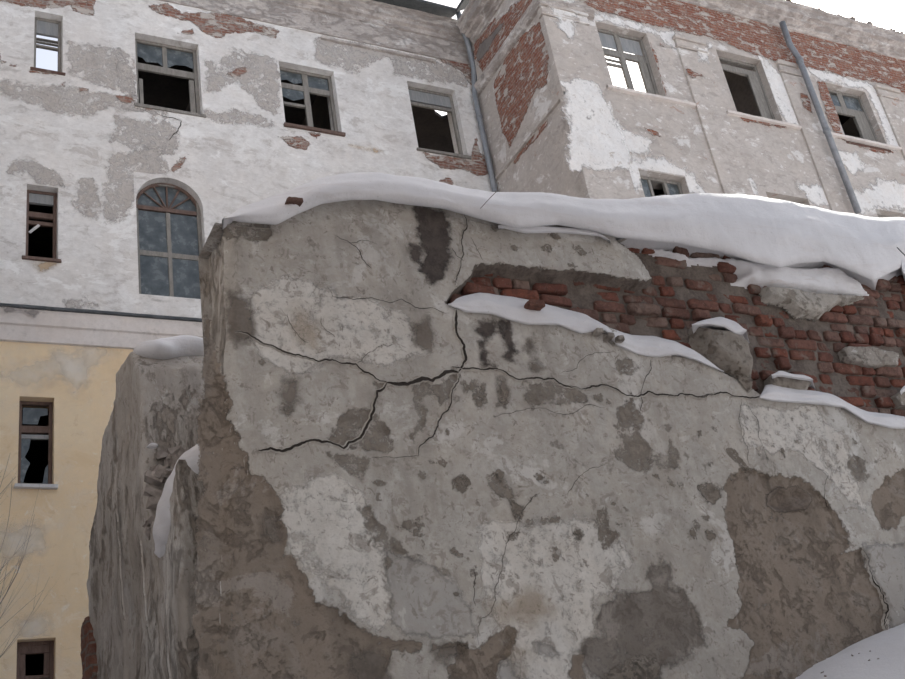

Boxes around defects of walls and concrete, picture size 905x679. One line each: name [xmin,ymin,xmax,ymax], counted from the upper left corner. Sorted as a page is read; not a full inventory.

spalling [0,0,96,16]
spalling [149,3,279,38]
spalling [315,0,549,164]
spalling [423,138,488,185]
peeling [560,78,705,193]
spalling [552,0,905,175]
crack [452,214,483,286]
crack [235,289,768,463]
spalling [445,240,905,417]
spalling [190,315,708,679]
peeling [690,515,716,540]
spalling [697,405,905,679]